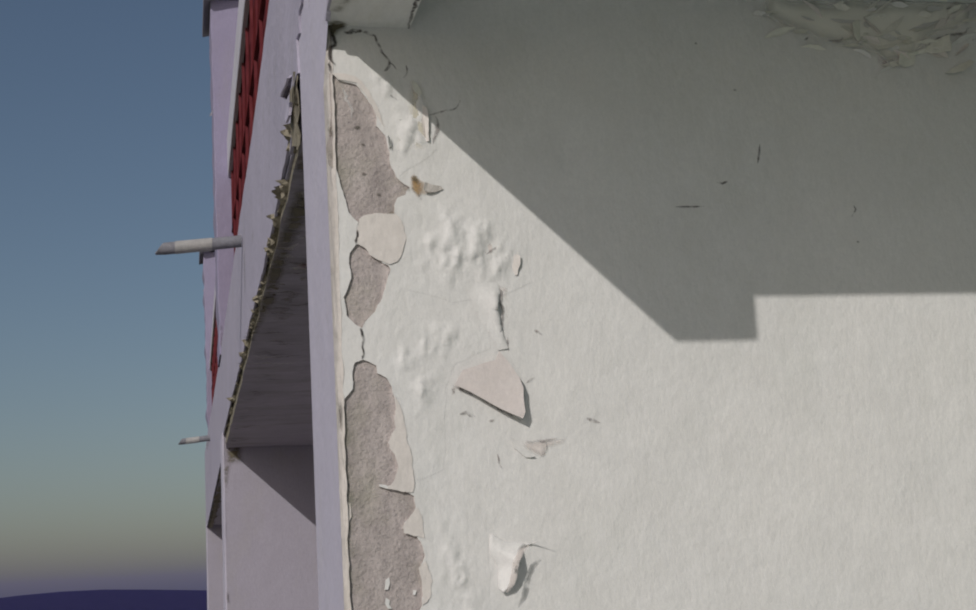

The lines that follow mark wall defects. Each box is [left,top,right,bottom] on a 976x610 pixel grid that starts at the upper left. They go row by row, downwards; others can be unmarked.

spalling [225,179,305,442]
spalling [280,72,301,154]
peeling [326,73,409,328]
crack [328,29,408,71]
peeling [340,360,433,610]
peeling [452,351,525,419]